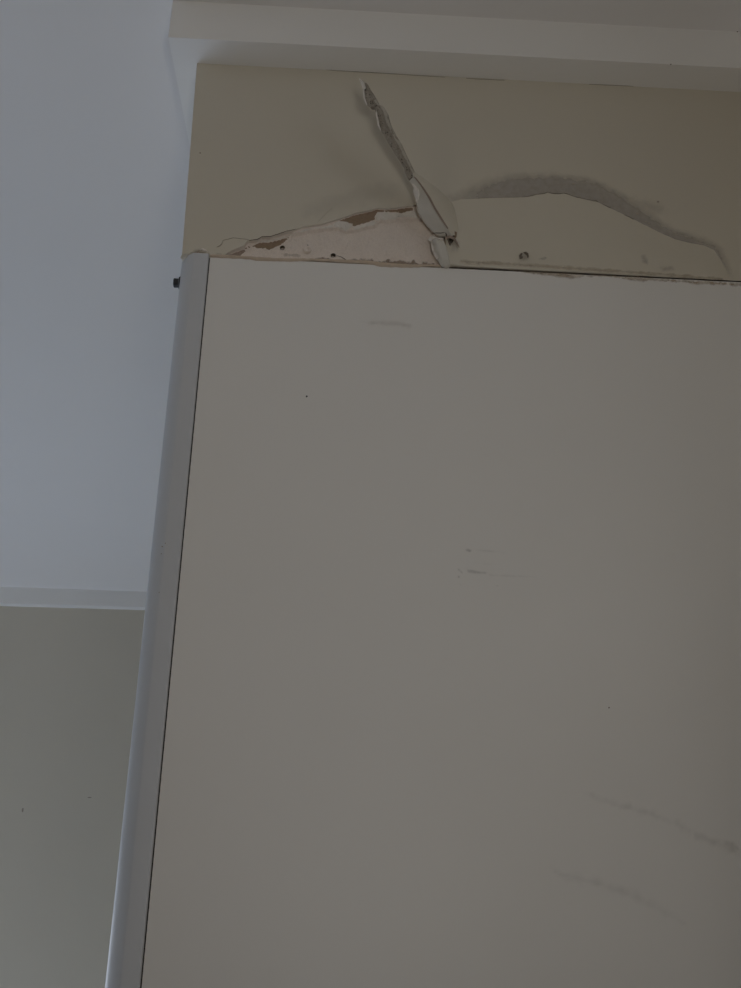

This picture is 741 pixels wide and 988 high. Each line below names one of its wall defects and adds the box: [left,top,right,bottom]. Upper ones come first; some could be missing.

flaking render [230,78,459,268]
crack [449,267,741,282]